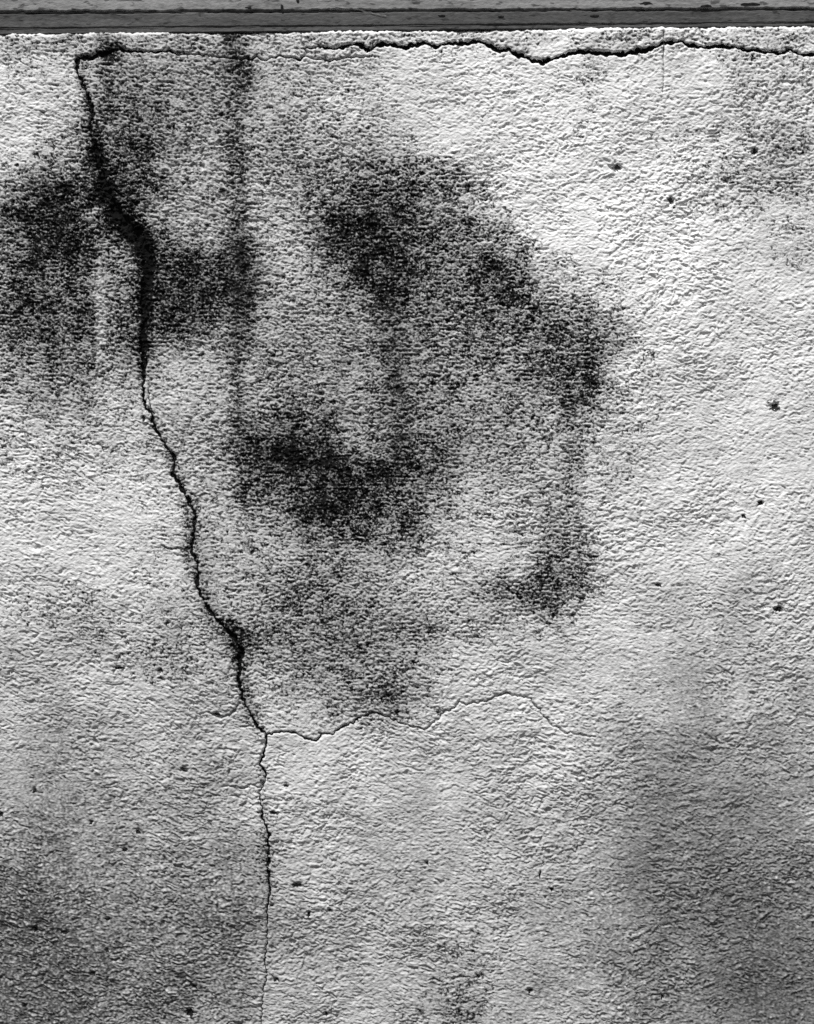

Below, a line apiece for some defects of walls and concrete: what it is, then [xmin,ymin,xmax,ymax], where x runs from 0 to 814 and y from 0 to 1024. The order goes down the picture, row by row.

crack [75,48,579,1024]
water stain [0,32,662,738]
crack [236,31,814,66]
water stain [672,47,814,268]